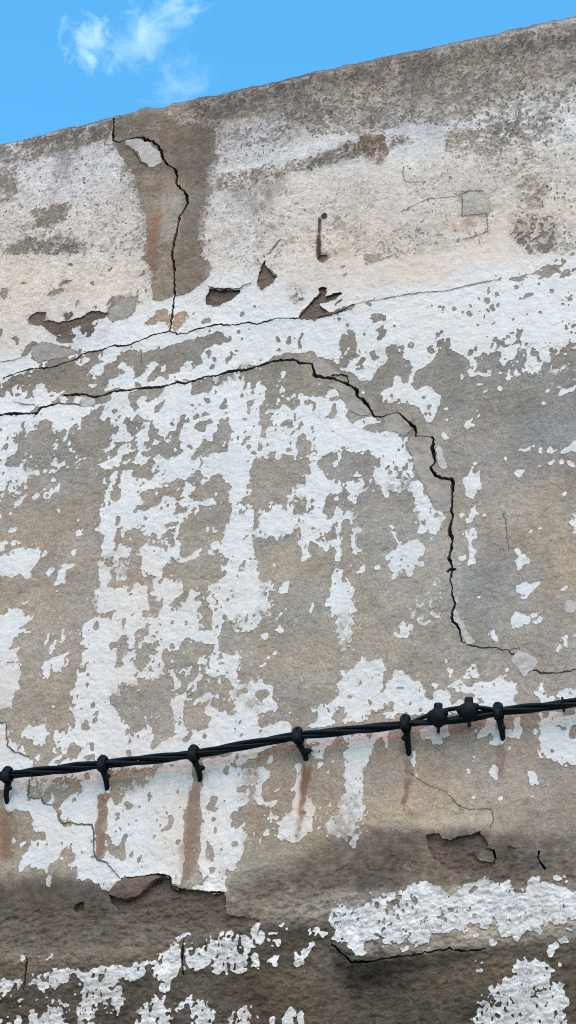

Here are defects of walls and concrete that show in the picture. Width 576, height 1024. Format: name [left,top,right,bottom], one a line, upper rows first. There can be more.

crack [114,137,189,204]
crack [173,258,251,296]
crack [356,279,499,304]
peeling [0,18,576,772]
crack [312,367,375,417]
crack [409,424,576,674]
crack [1,722,135,903]
rust [298,766,311,829]
peeling [489,765,499,780]
peeling [528,771,539,798]
peeling [0,731,389,1024]
peeling [294,833,576,1024]